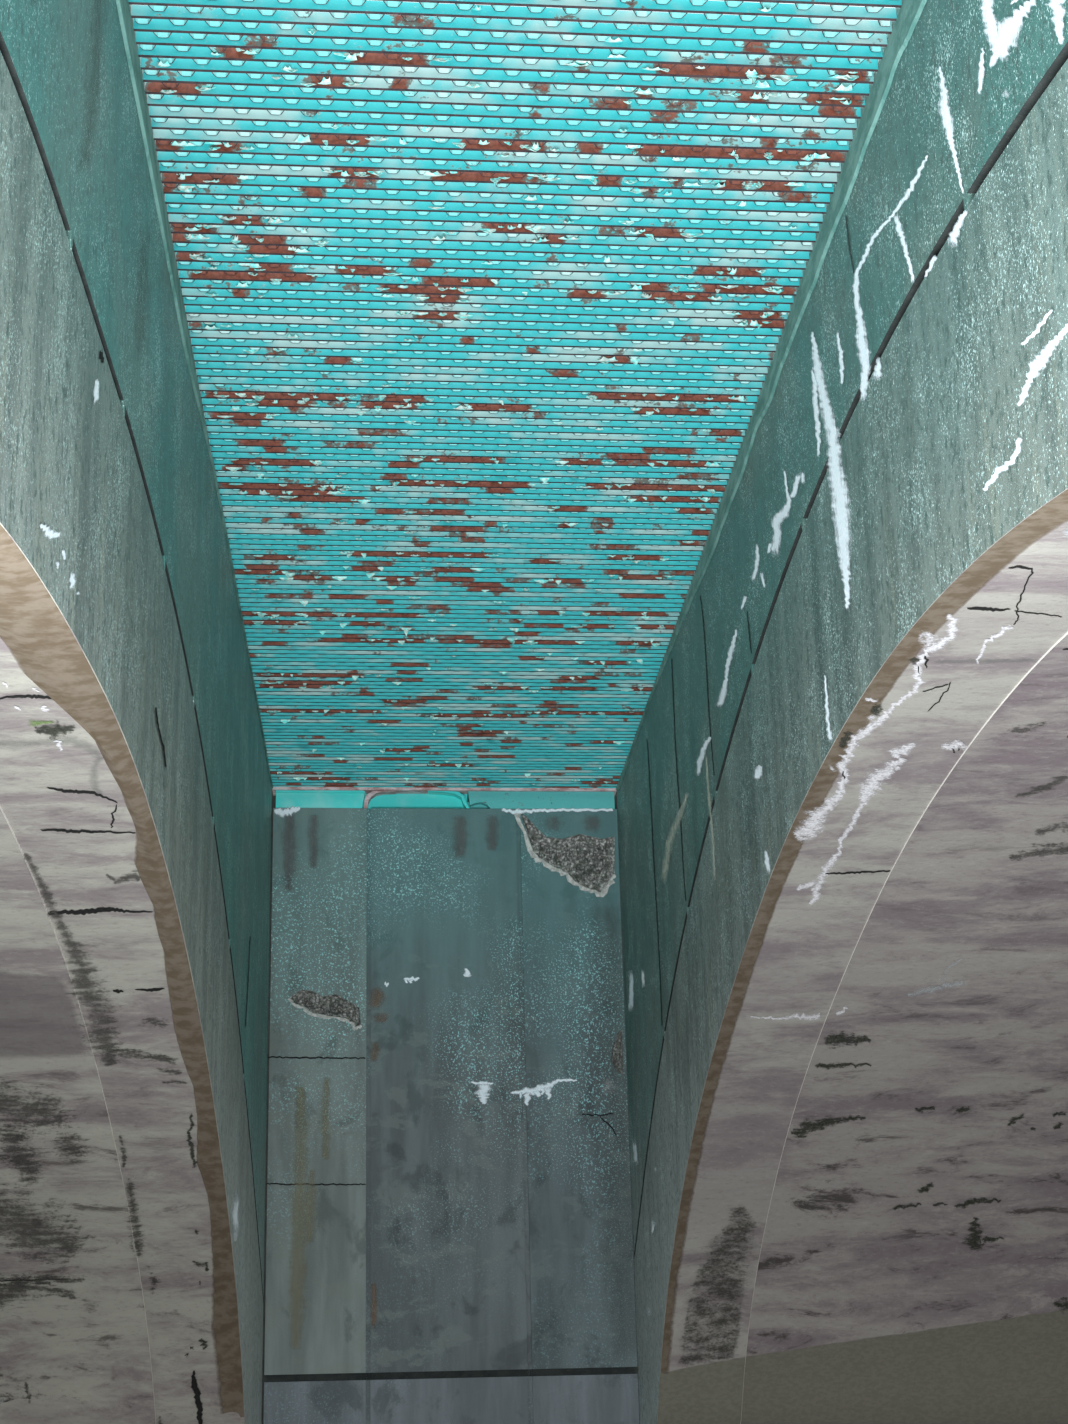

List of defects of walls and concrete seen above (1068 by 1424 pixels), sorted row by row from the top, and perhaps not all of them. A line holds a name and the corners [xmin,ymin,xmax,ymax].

crack [978,0,1035,93]
crack [846,155,928,399]
leakage [811,332,851,609]
spalling [288,990,362,1030]
spalling [502,808,616,897]
leakage [649,489,1068,1373]
crack [794,566,1068,905]